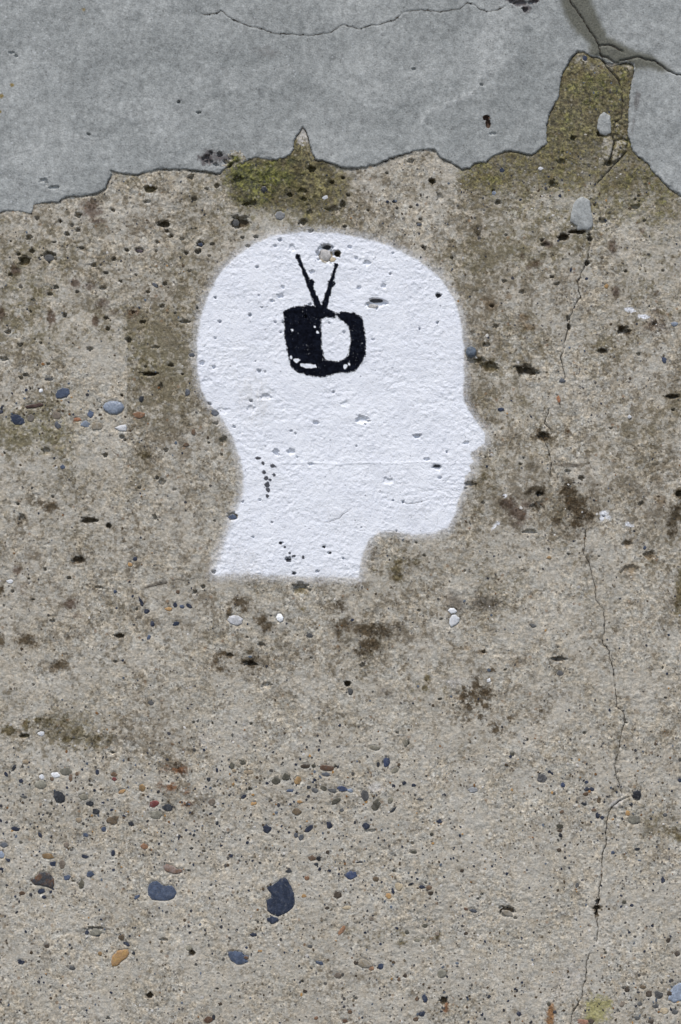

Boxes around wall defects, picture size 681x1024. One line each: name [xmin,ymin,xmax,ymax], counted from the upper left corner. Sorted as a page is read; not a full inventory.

crack [203,2,503,36]
crack [570,0,680,184]
flaking render [194,145,233,170]
flaking render [296,127,308,147]
flaking render [597,112,630,166]
spalling [143,184,158,194]
spalling [229,217,251,230]
flaking render [557,197,593,242]
spalling [18,255,32,267]
crack [541,238,591,479]
peeling [254,456,277,499]
crack [570,530,628,1024]